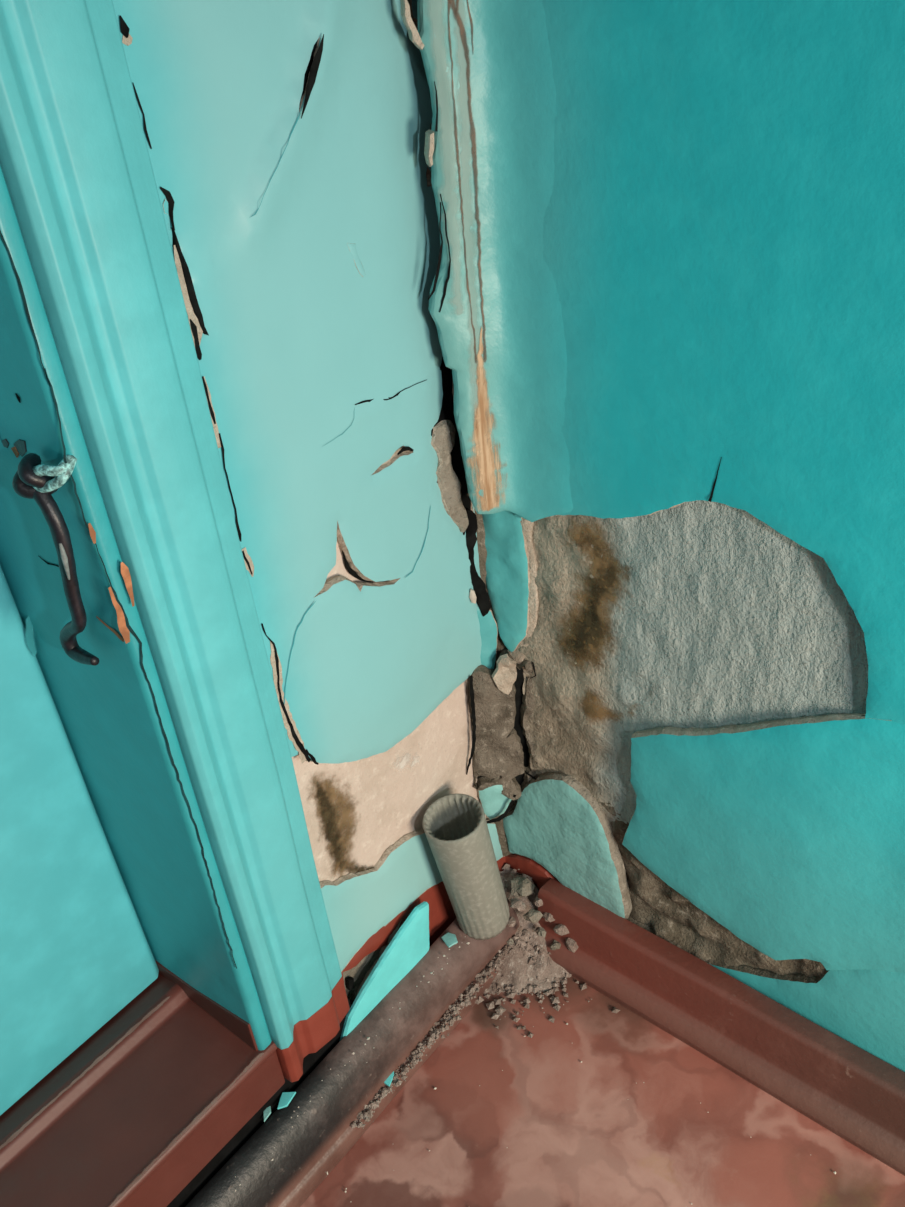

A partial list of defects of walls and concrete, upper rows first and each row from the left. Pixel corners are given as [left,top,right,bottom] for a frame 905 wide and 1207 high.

crack [400,0,425,50]
crack [251,34,324,217]
corrosion [448,0,502,511]
crack [160,187,254,577]
crack [0,230,237,969]
crack [262,601,319,765]
leakage [313,777,375,876]
crack [325,357,537,824]
flaking render [292,500,868,977]
leakage [559,524,629,669]
leakage [582,692,632,720]
flaking render [343,947,382,1006]